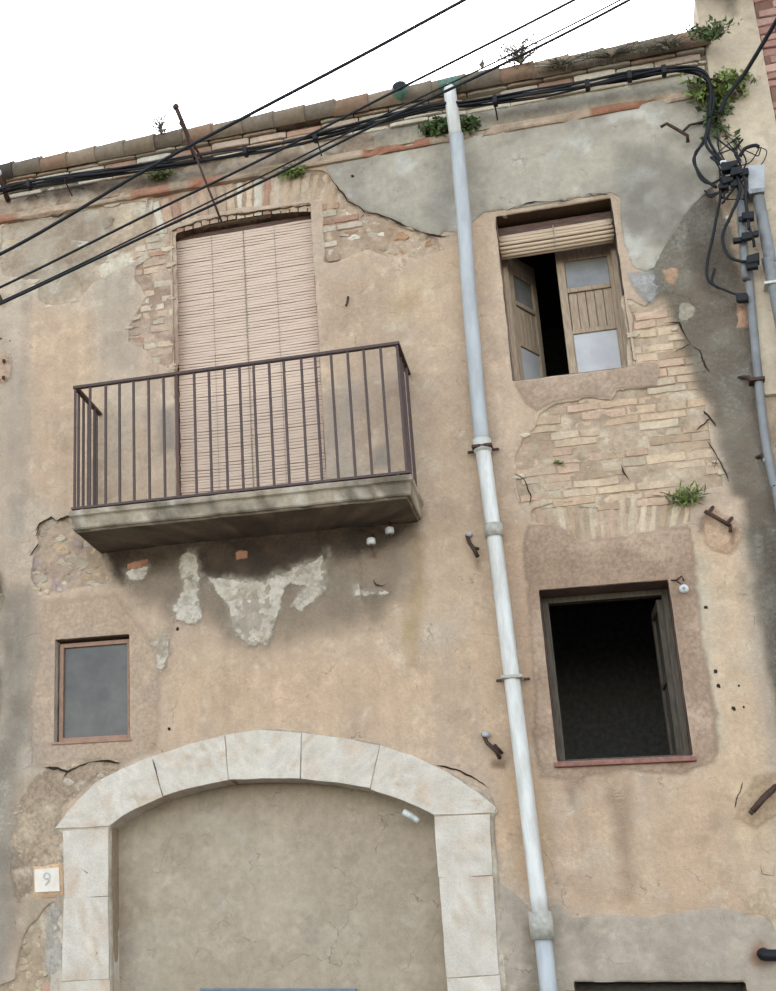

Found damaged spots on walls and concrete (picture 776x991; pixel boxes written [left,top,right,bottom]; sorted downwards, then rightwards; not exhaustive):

spalling [0,171,439,372]
crack [668,322,710,372]
spalling [511,293,730,541]
crack [697,410,729,481]
leakage [654,190,776,686]
peeling [150,549,329,670]
crack [44,760,119,776]